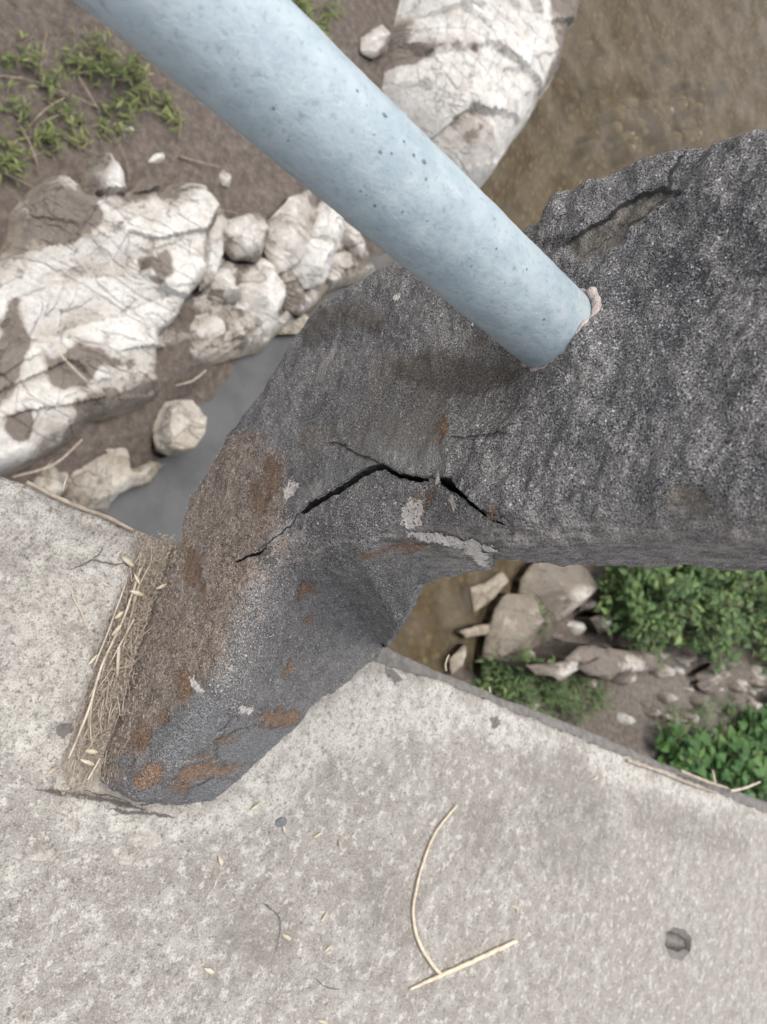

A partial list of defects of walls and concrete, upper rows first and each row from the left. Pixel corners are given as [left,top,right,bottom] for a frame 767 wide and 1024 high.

crack [563,147,688,245]
crack [236,441,511,563]
rust [131,709,241,796]